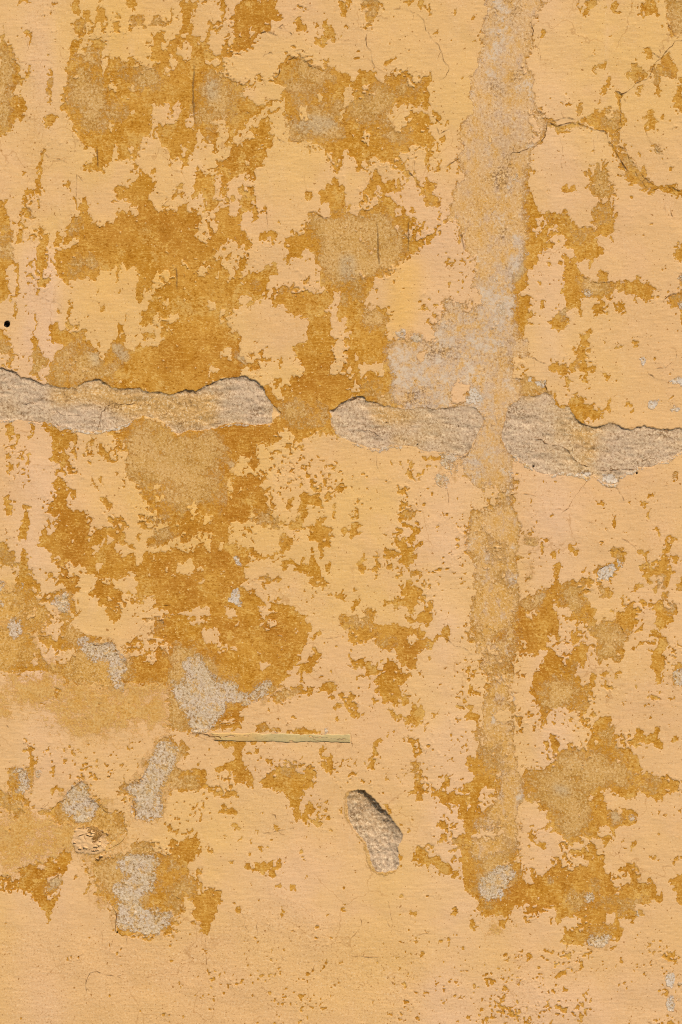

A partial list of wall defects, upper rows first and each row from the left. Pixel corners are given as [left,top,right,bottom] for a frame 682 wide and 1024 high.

peeling [293,0,385,48]
peeling [403,0,432,20]
crack [511,24,680,216]
flaking render [624,395,681,416]
peeling [2,494,16,516]
peeling [255,722,328,737]
peeling [364,730,395,770]
spalling [339,779,411,876]
peeling [668,856,682,906]
peeling [399,910,468,953]
peeling [387,976,459,1021]